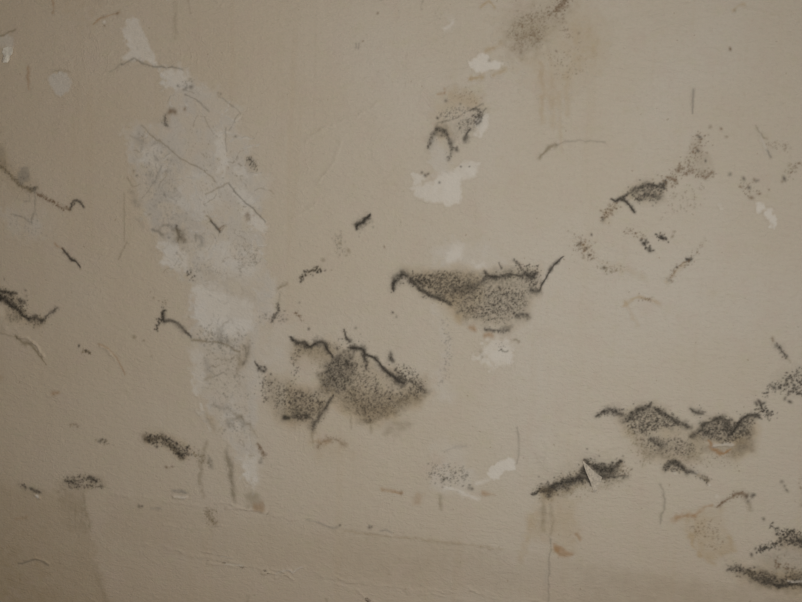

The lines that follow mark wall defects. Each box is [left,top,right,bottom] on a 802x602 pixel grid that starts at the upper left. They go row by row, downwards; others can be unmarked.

peeling [467,52,505,74]
damp [424,0,615,163]
damp [0,278,61,333]
peeling [115,14,300,497]
damp [152,257,435,467]
damp [351,211,375,238]
peeling [404,141,484,208]
peeling [470,334,521,374]
damp [387,229,648,339]
damp [623,226,677,254]
damp [598,124,729,227]
damp [0,335,802,602]